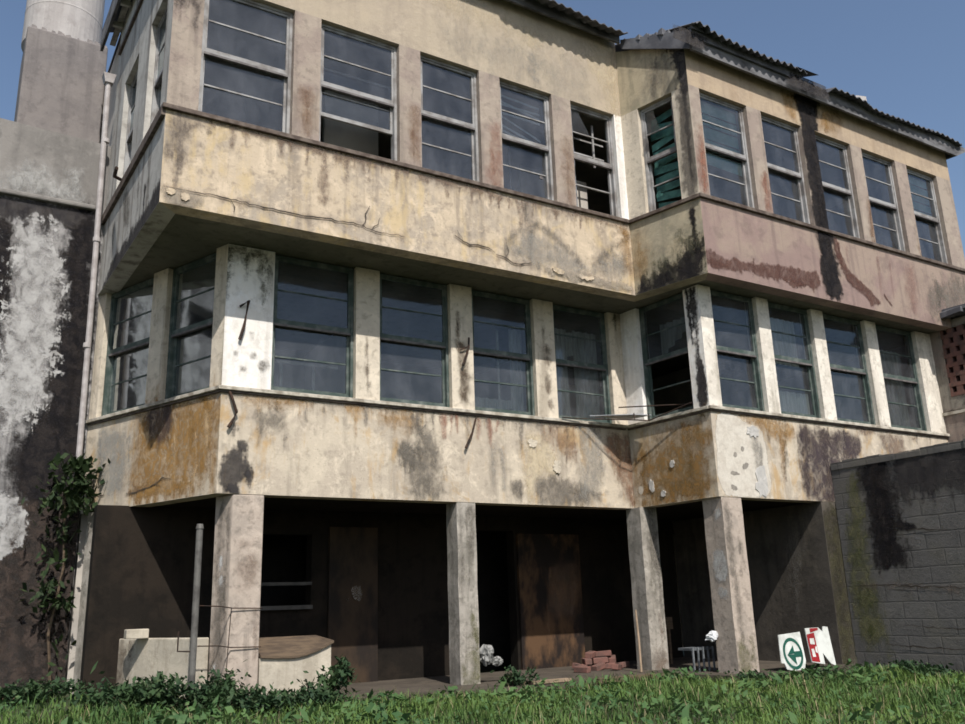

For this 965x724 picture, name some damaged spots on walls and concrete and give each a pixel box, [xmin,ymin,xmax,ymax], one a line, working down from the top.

water stain [666,26,708,195]
crack [166,186,403,237]
crack [455,230,540,267]
water stain [637,72,892,407]
water stain [0,165,160,693]
rust [130,396,220,504]
water stain [219,440,253,494]
water stain [399,411,444,498]
rust [604,415,712,505]
peeling [715,412,771,498]
water stain [784,425,965,664]